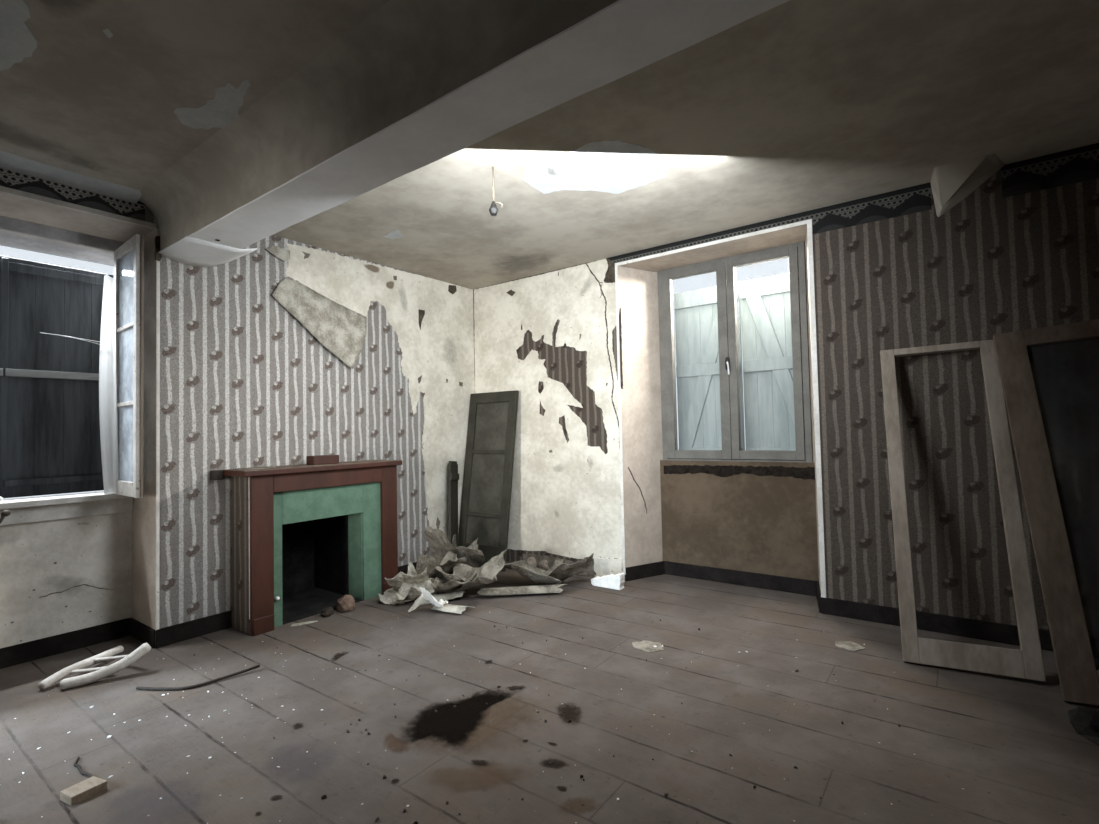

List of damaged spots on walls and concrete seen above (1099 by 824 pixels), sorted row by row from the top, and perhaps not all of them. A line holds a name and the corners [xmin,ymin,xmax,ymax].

peeling [0,0,37,71]
peeling [174,79,251,129]
peeling [522,140,667,194]
peeling [266,243,623,577]
crack [585,263,647,513]